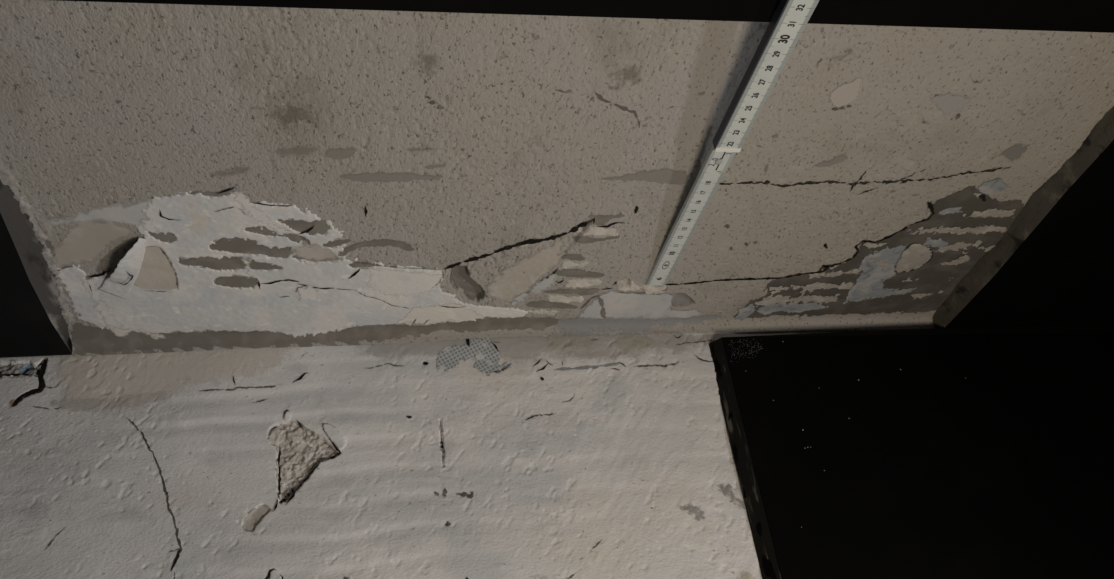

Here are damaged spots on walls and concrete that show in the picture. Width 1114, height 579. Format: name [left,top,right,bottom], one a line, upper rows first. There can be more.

peeling [43,187,702,356]
crack [666,167,1010,285]
flaking render [734,178,1024,321]
flaking render [0,361,40,380]
crack [10,359,62,410]
crack [127,418,182,579]
spalling [243,410,346,531]